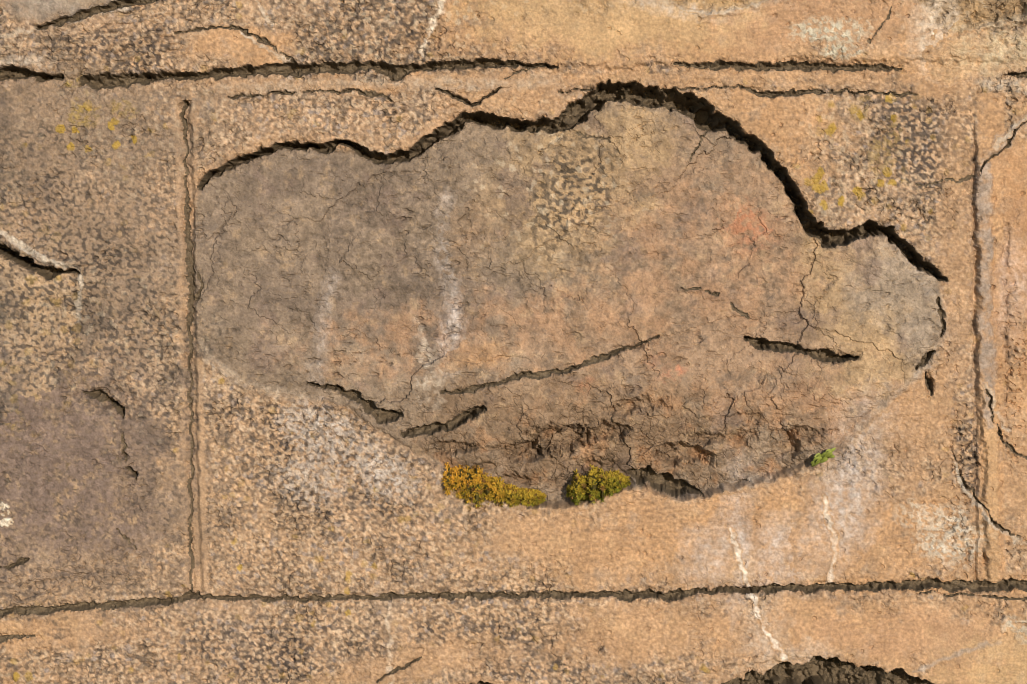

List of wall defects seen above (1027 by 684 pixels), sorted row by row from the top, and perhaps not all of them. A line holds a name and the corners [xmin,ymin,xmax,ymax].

crack [0,0,158,39]
crack [0,229,85,324]
spalling [192,101,940,506]
crack [197,63,948,396]
crack [307,335,660,438]
crack [983,382,1027,460]
crack [951,450,1027,546]
crack [919,590,1027,601]
crack [376,657,422,683]
crack [721,655,934,684]